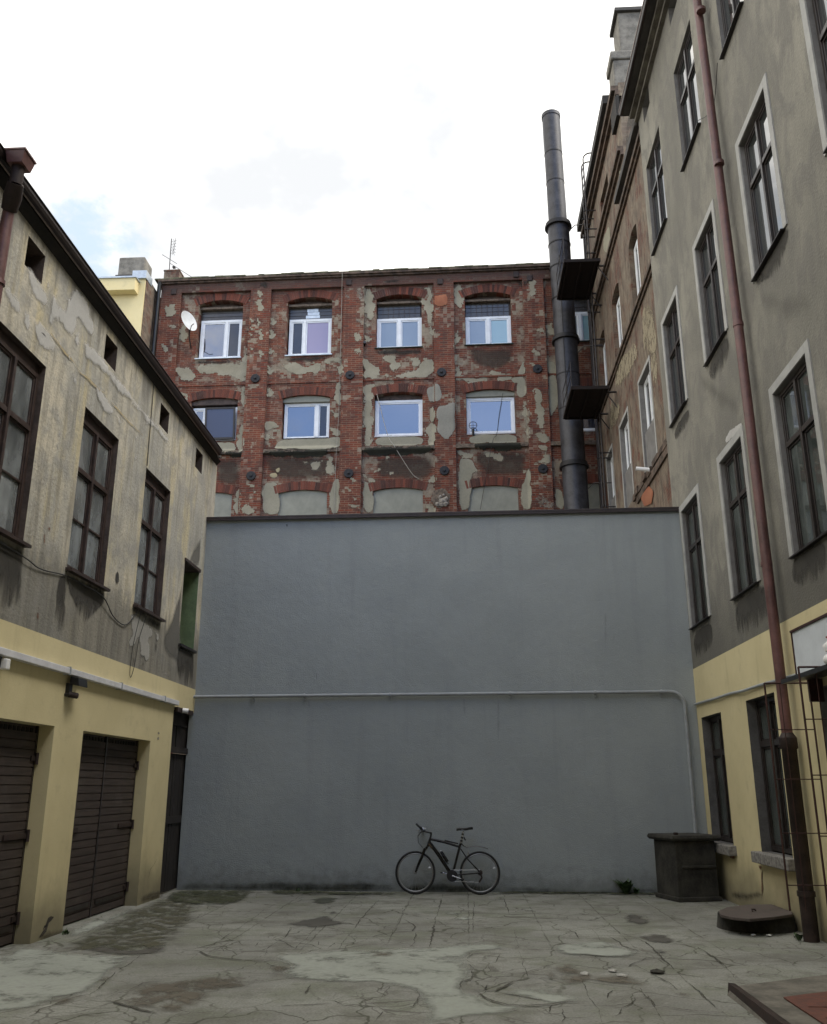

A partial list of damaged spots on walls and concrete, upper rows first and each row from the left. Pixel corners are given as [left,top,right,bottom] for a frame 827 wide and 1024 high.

peeling [242,318,277,362]
peeling [518,361,556,374]
peeling [523,417,551,473]
damp [0,541,22,605]
damp [57,575,104,622]
damp [135,594,193,684]
crack [39,916,54,938]
crack [184,895,734,1021]
crack [33,957,157,1021]